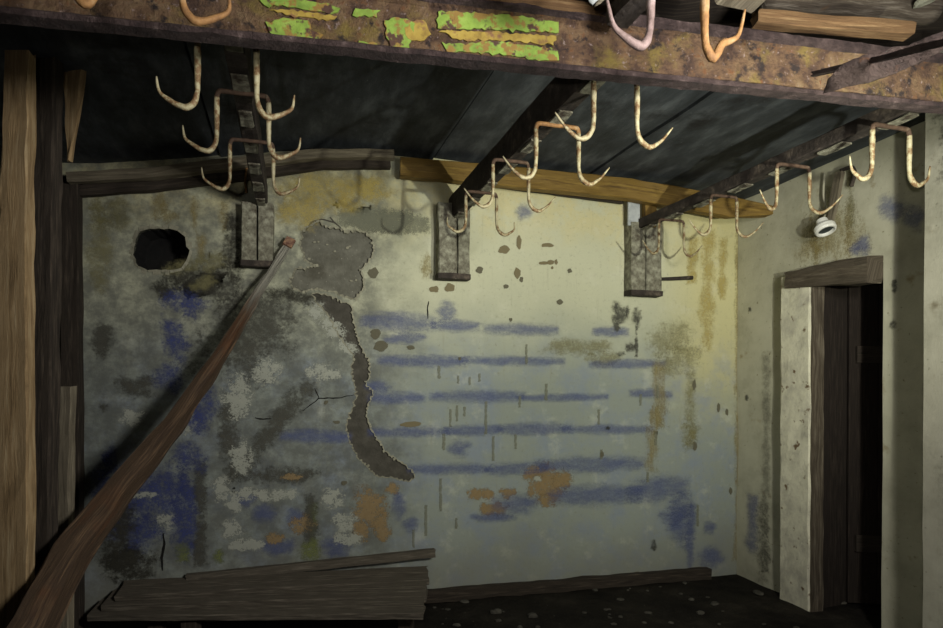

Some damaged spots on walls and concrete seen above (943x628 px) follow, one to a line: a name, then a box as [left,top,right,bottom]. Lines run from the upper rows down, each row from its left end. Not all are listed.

spalling [129,224,193,276]
flaking render [288,219,415,482]